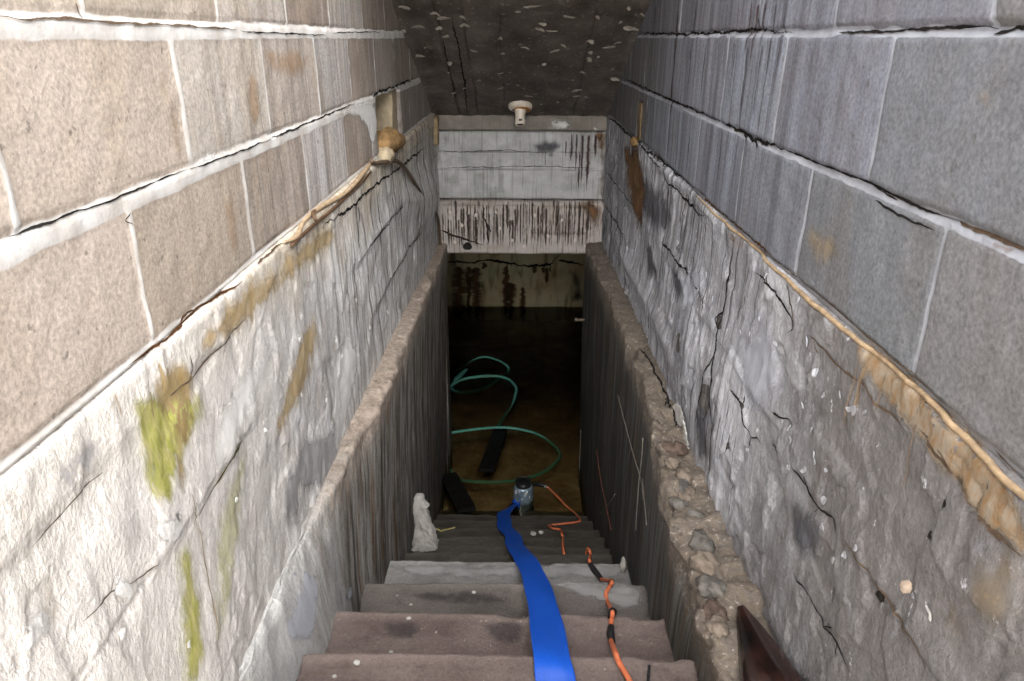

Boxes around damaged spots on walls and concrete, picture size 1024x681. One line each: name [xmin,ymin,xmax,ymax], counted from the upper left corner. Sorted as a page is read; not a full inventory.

crack [443,18,468,114]
crack [9,78,412,237]
corrosion [583,201,599,224]
corrosion [624,147,645,226]
crack [627,79,1024,250]
water stain [150,364,194,444]
water stain [287,199,389,518]
crack [609,118,1024,677]
crack [32,472,103,547]
crack [197,440,243,517]
crack [84,564,159,621]
water stain [192,494,219,635]